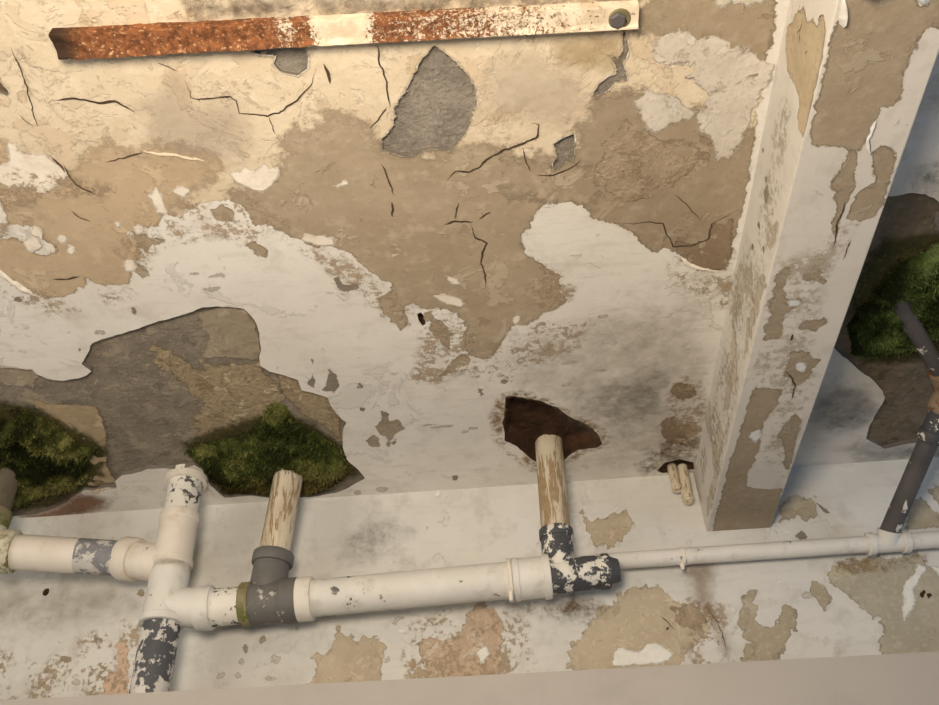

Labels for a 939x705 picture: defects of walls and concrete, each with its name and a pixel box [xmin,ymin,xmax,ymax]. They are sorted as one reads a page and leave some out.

crack [158,63,331,133]
crack [370,45,390,128]
crack [448,123,581,179]
crack [381,164,394,217]
crack [445,203,490,287]
peeling [0,0,939,540]
peeling [579,509,634,550]
peeling [29,625,141,698]
peeling [306,625,390,684]
peeling [393,601,529,679]
peeling [566,583,798,670]
peeling [802,553,939,654]